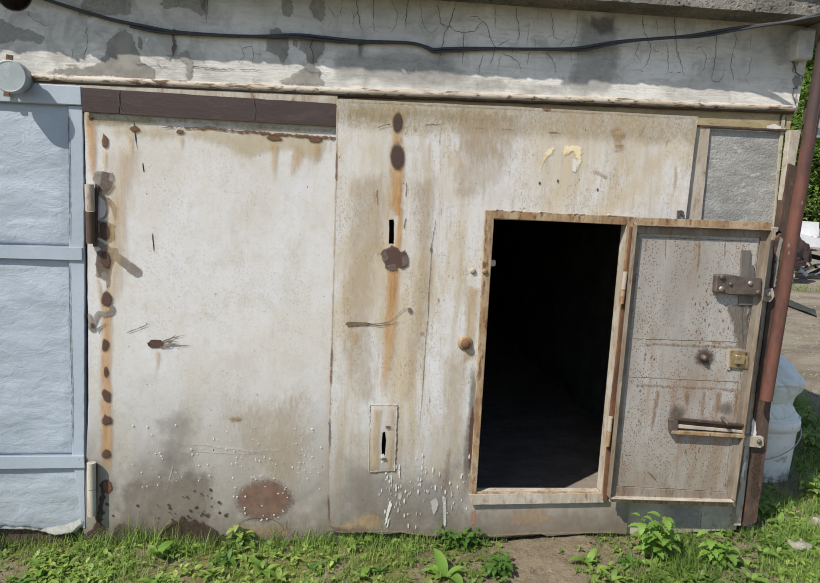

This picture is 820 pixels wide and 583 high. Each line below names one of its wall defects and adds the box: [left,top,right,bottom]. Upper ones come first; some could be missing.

peeling [0,19,44,44]
peeling [50,29,155,79]
peeling [160,0,204,16]
peeling [266,28,325,85]
crack [329,0,579,74]
crack [636,18,763,82]
corrosion [34,80,795,126]
corrosion [380,113,408,369]
corrosion [86,116,337,460]
leakage [112,523,140,544]
leakage [157,488,228,545]
corrosion [233,475,294,539]